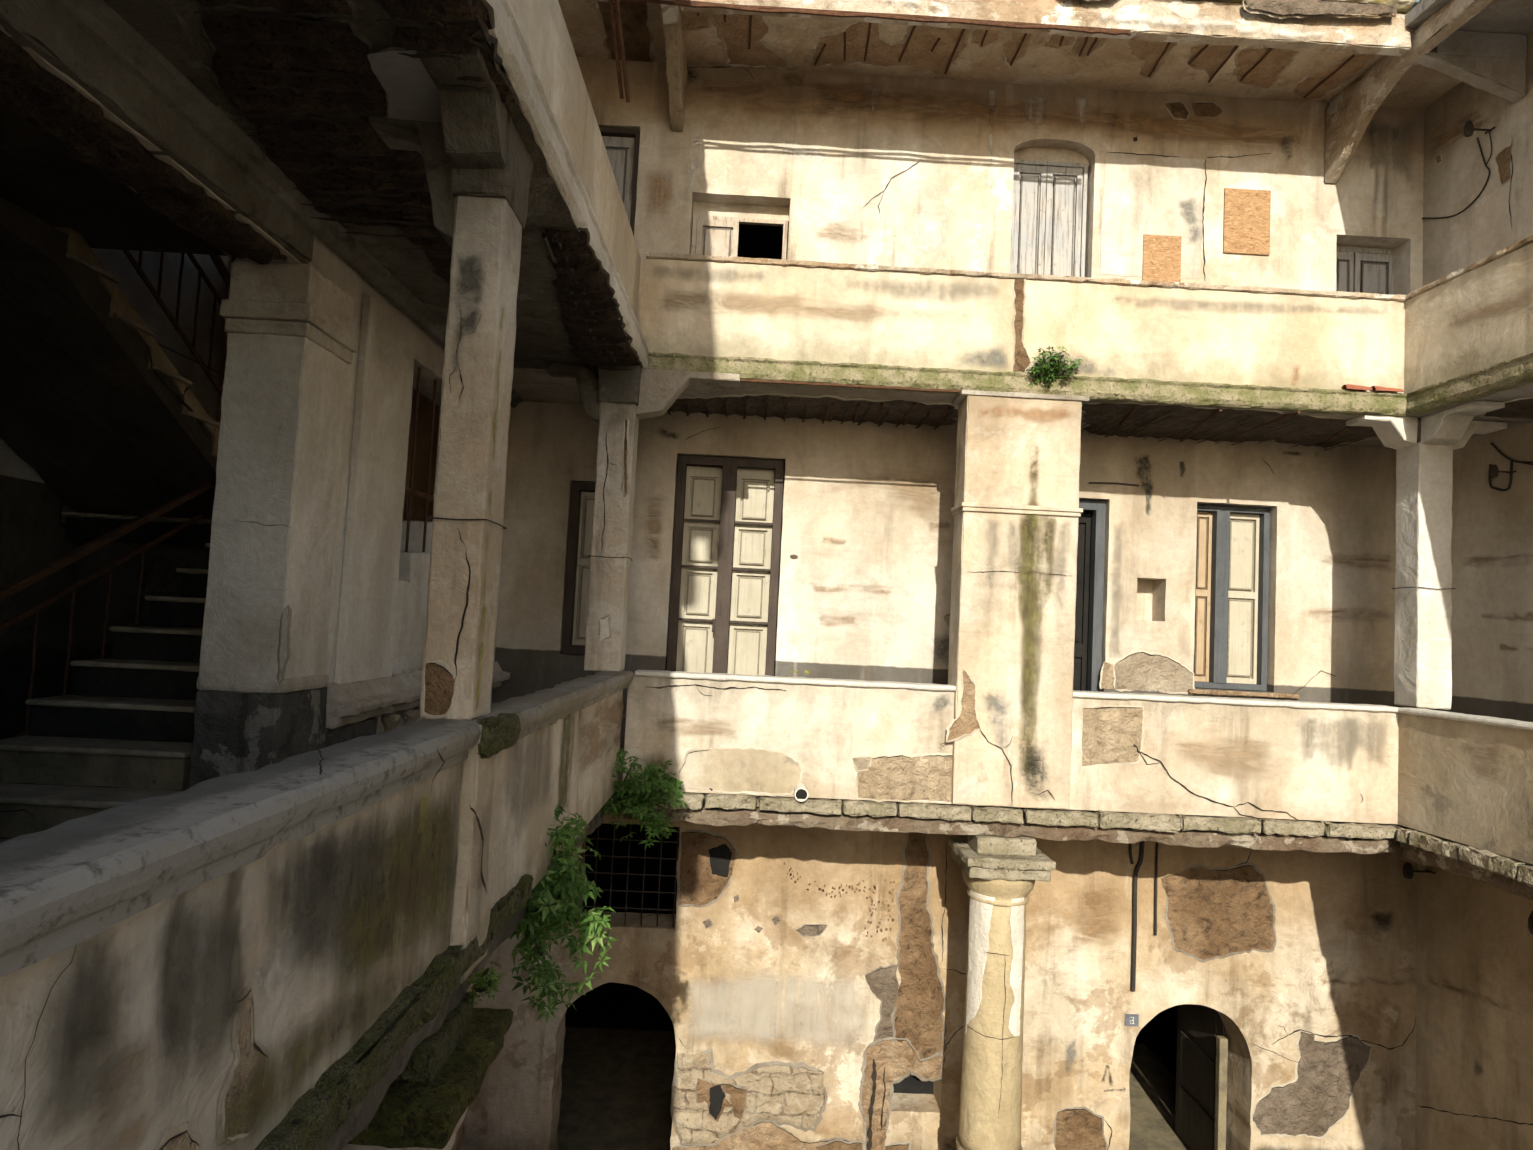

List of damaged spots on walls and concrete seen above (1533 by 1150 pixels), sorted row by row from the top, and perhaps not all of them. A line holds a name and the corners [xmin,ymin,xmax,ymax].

crack [863,161,919,218]
crack [454,528,471,680]
water stain [1012,514,1062,708]
flaking render [852,669,980,807]
water stain [1026,750,1045,789]
crack [1133,744,1299,866]
water stain [56,946,145,1145]
water stain [169,871,242,1058]
flaking render [670,829,947,1150]
flaking render [1053,1106,1108,1150]
flaking render [1161,862,1277,963]
flaking render [1251,1031,1374,1139]